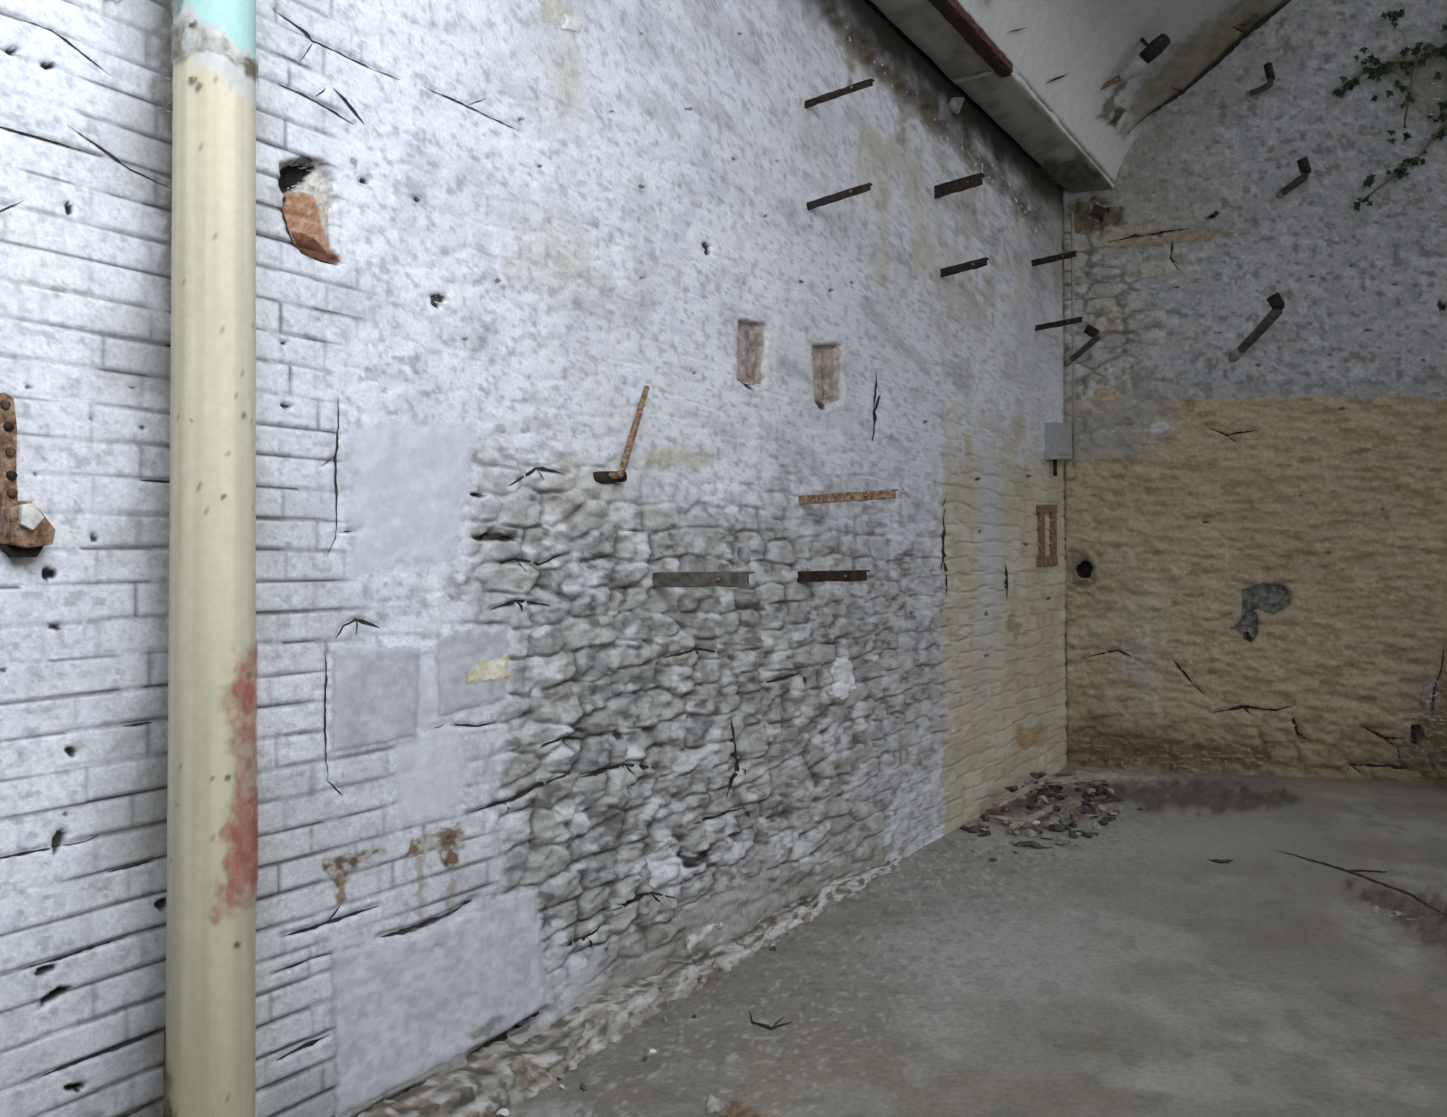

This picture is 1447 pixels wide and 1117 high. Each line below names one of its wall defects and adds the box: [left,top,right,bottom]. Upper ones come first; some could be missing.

peeling [152,0,258,125]
spalling [278,160,340,265]
spalling [1230,583,1291,642]
crack [1173,660,1309,743]
crack [1432,645,1445,715]
crack [1347,725,1416,774]
corrosion [323,849,379,902]
corrosion [407,828,463,915]
damp [472,1017,502,1037]